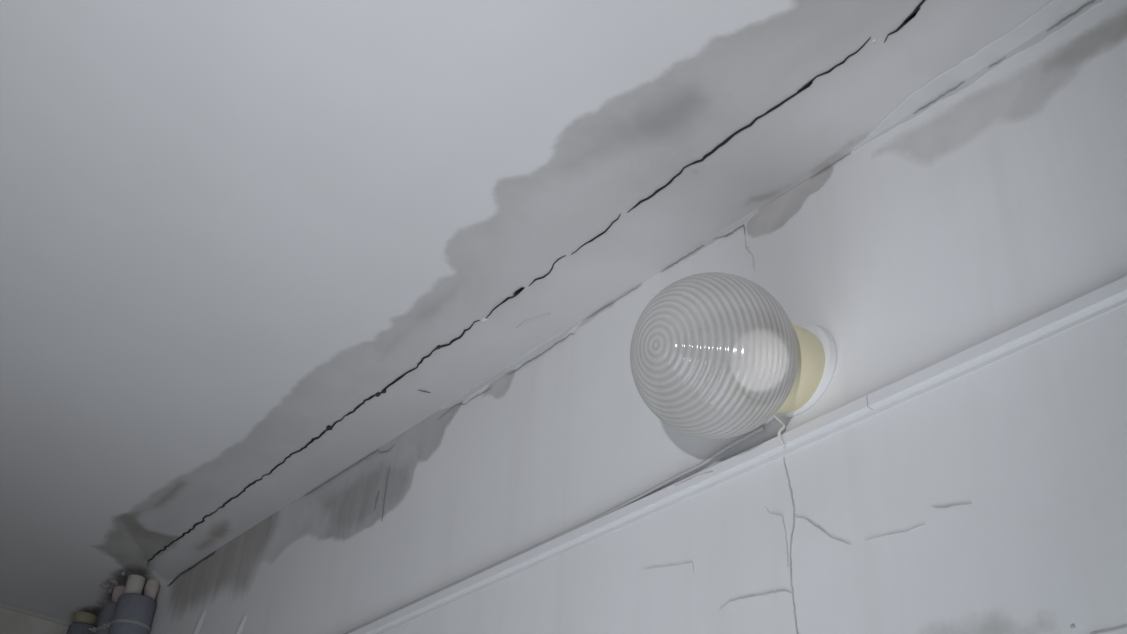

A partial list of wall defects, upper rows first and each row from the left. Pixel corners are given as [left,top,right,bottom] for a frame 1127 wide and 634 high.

crack [1047,0,1096,31]
crack [913,82,964,114]
crack [147,0,925,567]
crack [719,456,972,634]
crack [167,551,216,587]